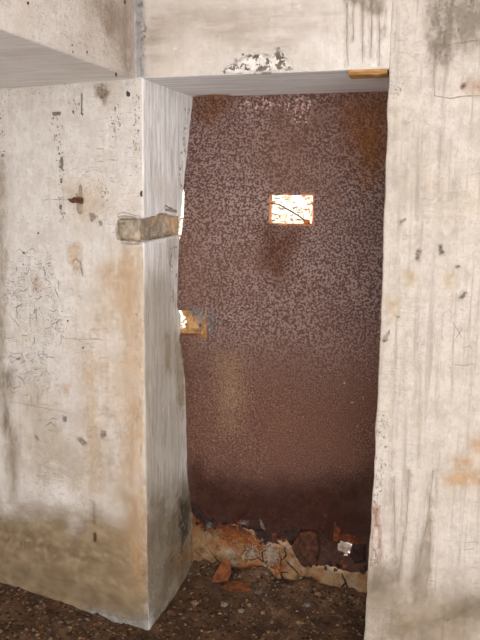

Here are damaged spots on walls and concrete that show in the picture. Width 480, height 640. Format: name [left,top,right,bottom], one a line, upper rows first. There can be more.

spalling [223,47,293,75]
crack [6,249,108,431]
water stain [0,483,193,631]
rust [191,503,368,575]
water stain [384,604,473,640]